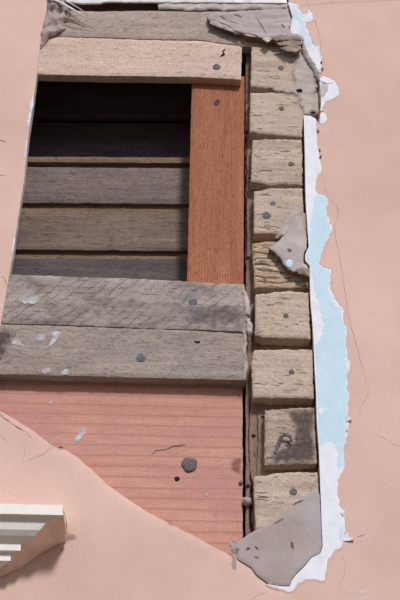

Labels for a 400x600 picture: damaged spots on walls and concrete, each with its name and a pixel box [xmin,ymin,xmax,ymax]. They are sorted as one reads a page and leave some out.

spalling [39,0,71,49]
peeling [266,2,354,594]
crack [0,413,63,463]
water stain [276,410,314,461]